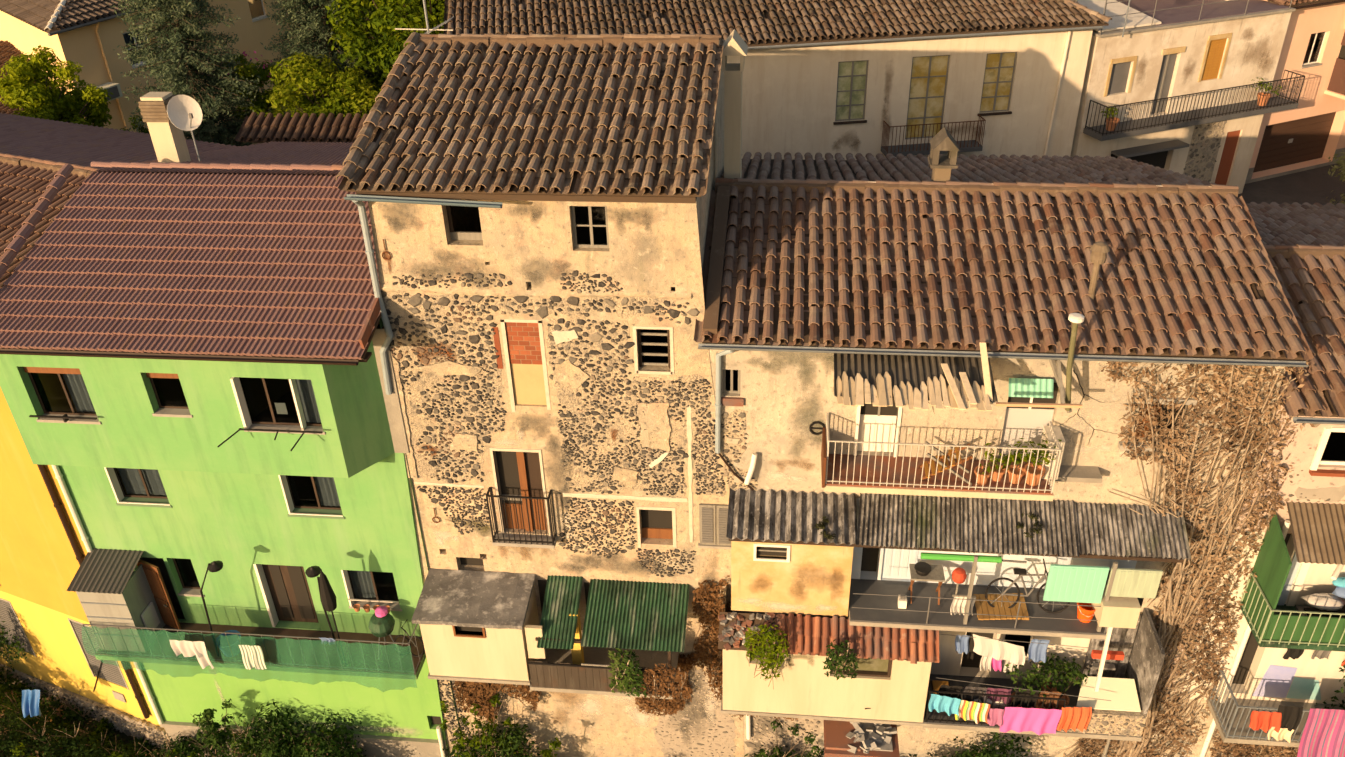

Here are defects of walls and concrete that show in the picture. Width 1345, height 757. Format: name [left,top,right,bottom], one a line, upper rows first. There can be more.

flaking render [381,270,758,577]